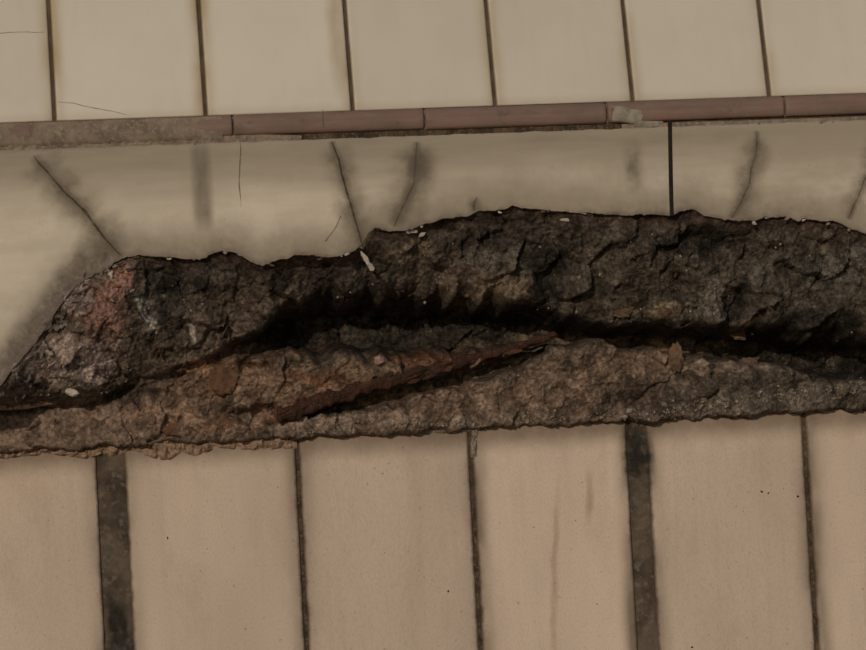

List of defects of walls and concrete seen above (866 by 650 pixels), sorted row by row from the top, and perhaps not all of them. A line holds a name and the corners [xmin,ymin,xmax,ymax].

crack [35,158,117,251]
crack [322,114,362,244]
spalling [0,206,866,460]